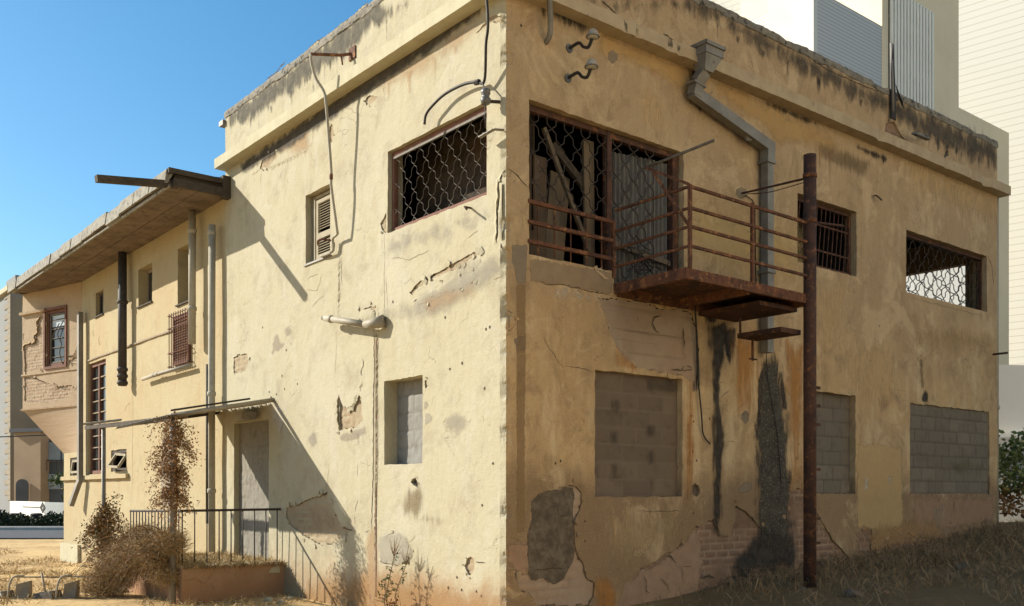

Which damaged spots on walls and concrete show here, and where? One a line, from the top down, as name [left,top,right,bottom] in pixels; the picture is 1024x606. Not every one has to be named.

mould [229,3,479,172]
damp [674,0,996,165]
flaking render [22,315,73,402]
flaking render [336,397,363,434]
crack [617,316,698,389]
damp [706,317,736,532]
damp [733,357,796,579]
flaking render [515,478,593,606]
flaking render [618,488,803,606]
flaking render [816,514,846,564]